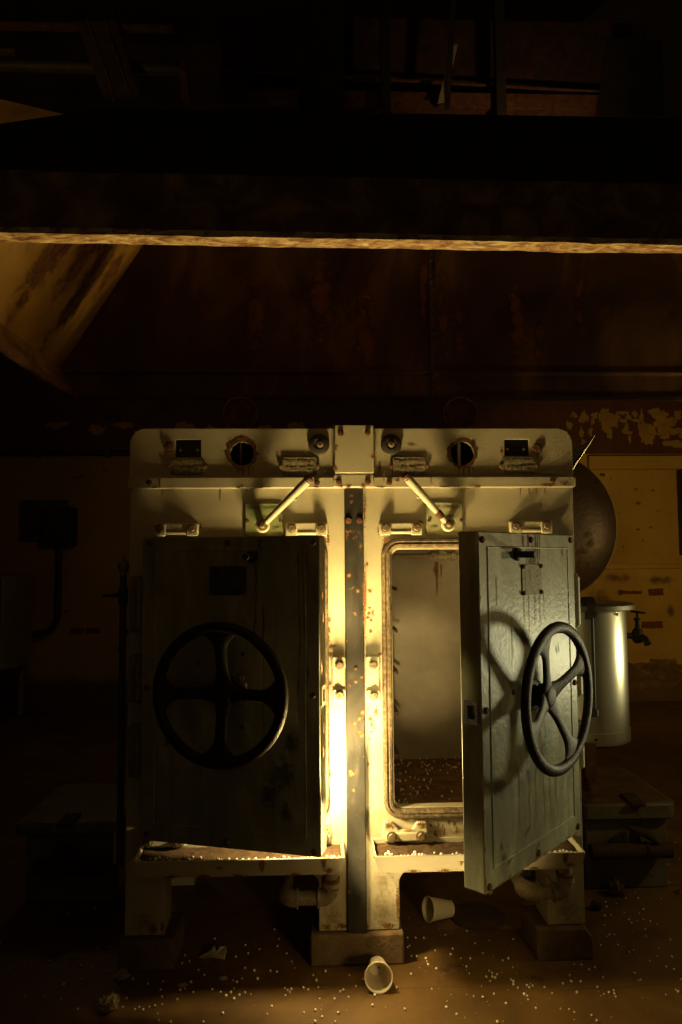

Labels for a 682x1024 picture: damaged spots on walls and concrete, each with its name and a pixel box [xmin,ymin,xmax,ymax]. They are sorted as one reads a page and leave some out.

peeling [566,408,682,448]